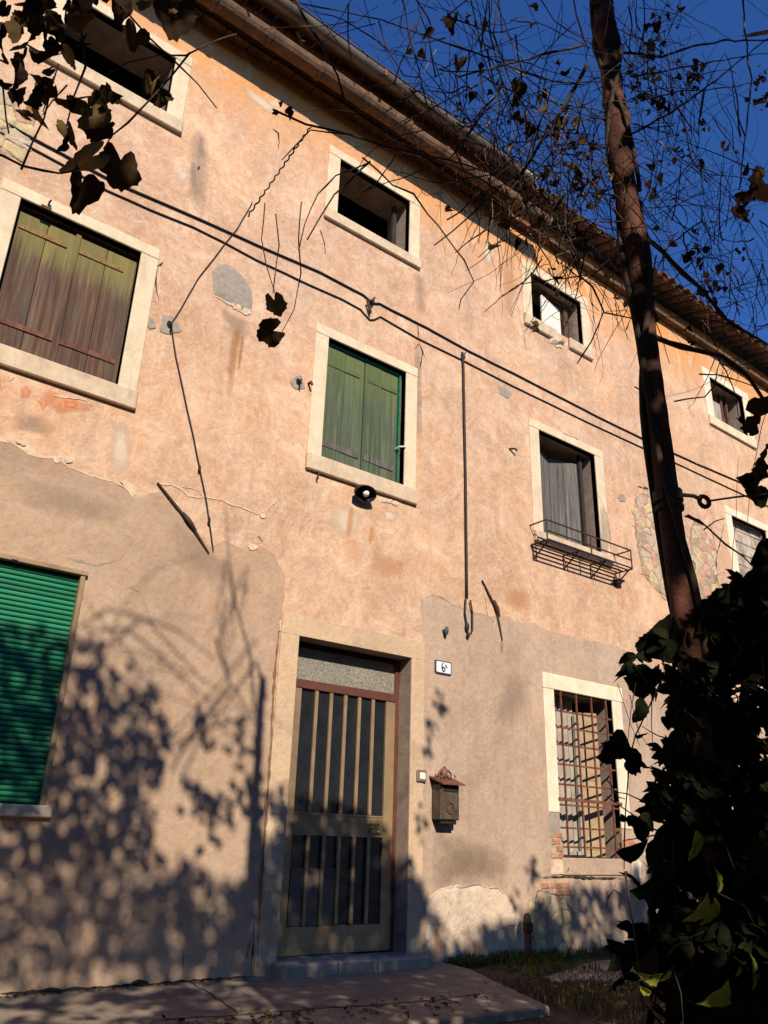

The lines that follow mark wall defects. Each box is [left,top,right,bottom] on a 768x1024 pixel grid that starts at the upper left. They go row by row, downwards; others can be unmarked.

peeling [21,388,87,411]
peeling [0,437,135,499]
spalling [631,489,667,600]
spalling [689,521,720,599]